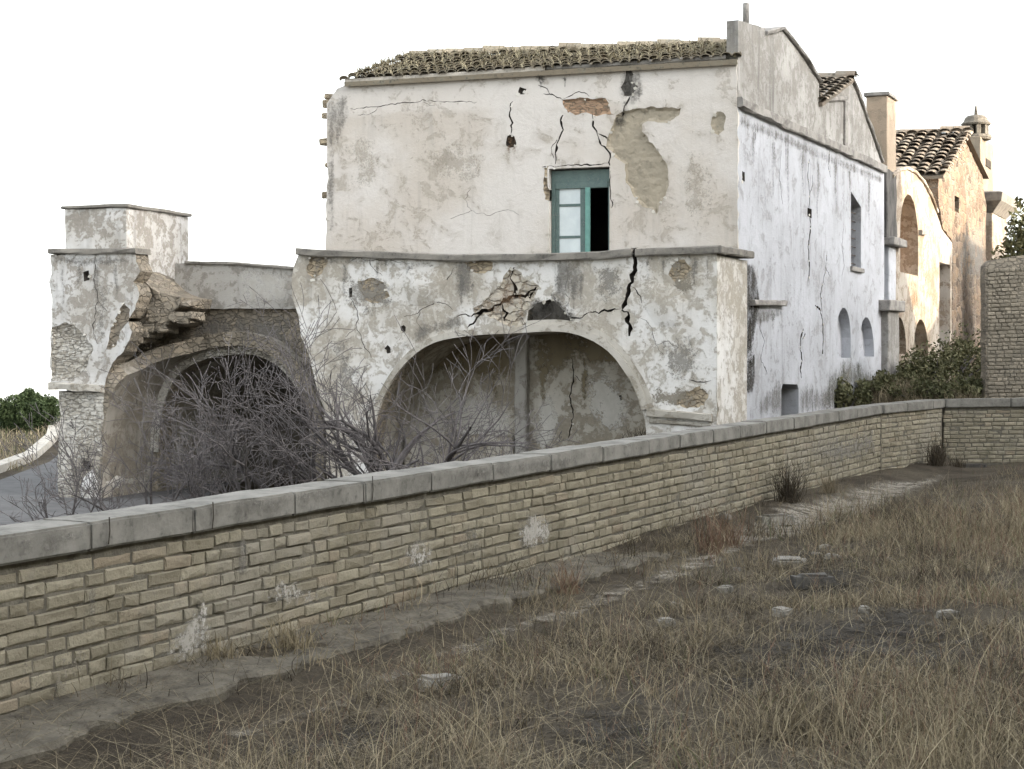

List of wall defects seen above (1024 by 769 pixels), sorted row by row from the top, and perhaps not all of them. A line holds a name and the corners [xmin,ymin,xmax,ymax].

crack [351,99,471,115]
crack [538,85,613,206]
flaking render [563,82,681,214]
flaking render [710,111,726,135]
flaking render [50,322,93,381]
flaking render [97,292,206,350]
peeling [344,276,391,313]
flaking render [465,261,572,328]
crack [568,360,595,438]
crack [572,248,677,358]
flaking render [651,342,709,409]
flaking render [668,258,695,294]